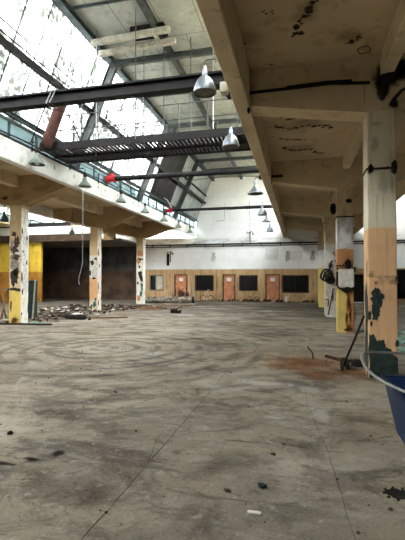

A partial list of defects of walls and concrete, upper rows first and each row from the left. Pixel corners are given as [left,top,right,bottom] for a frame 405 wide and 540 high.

peeling [8,228,28,295]
peeling [90,248,100,290]
peeling [365,262,399,378]
corrosion [267,357,367,379]
crack [81,432,175,540]